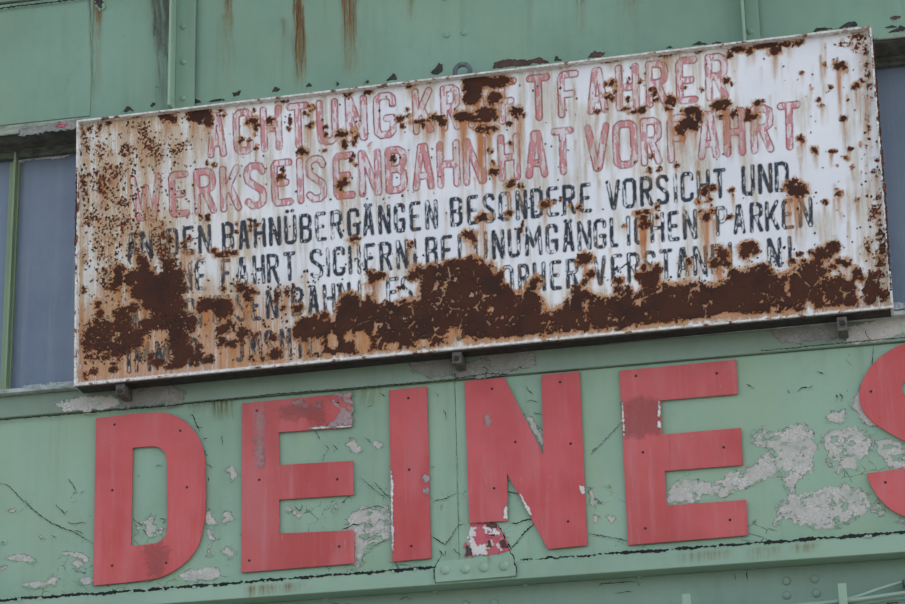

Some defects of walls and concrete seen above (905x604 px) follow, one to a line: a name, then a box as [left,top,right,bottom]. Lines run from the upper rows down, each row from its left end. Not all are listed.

corrosion [293,0,304,65]
corrosion [78,33,891,382]
peeling [53,385,186,415]
peeling [61,550,94,586]
crack [0,367,507,602]
peeling [327,471,395,570]
peeling [463,504,512,558]
peeling [666,383,905,532]